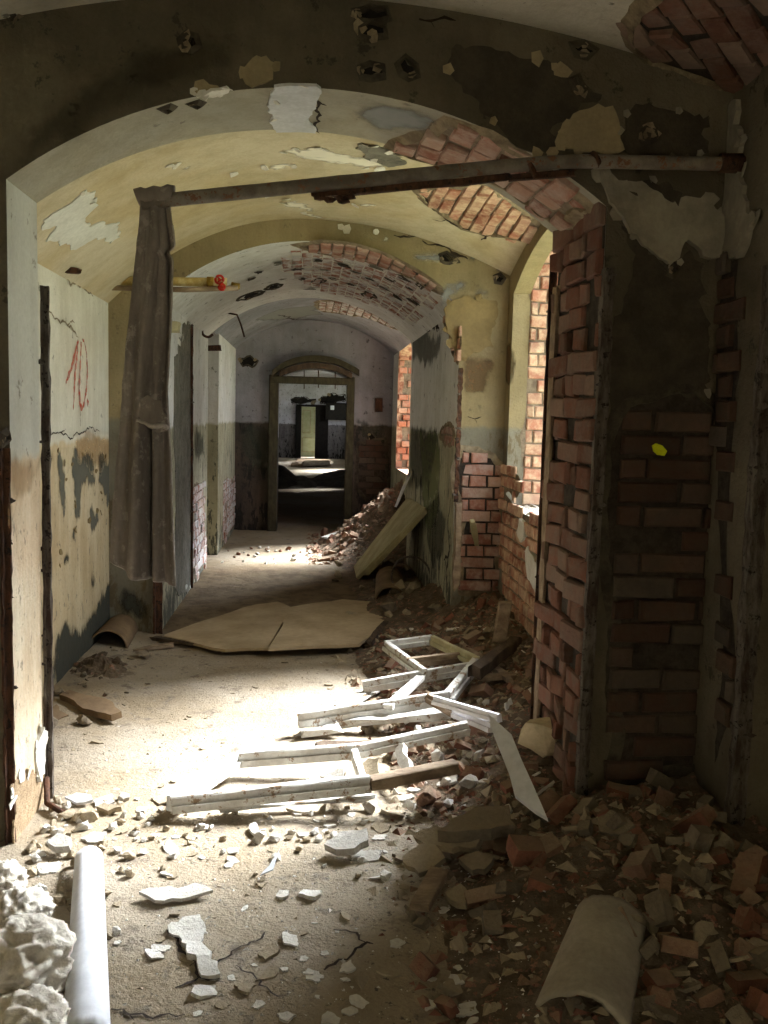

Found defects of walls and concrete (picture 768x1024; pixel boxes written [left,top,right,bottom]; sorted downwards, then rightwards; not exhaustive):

peeling [239,55,280,88]
crack [313,100,327,133]
flaking render [261,39,710,172]
corrosion [311,169,577,197]
peeling [41,190,121,250]
flaking render [236,224,498,365]
flaking render [412,0,768,796]
crack [51,426,100,440]
flaking render [173,320,207,596]
water stain [410,427,445,577]
crack [167,929,287,997]
crack [324,929,373,970]